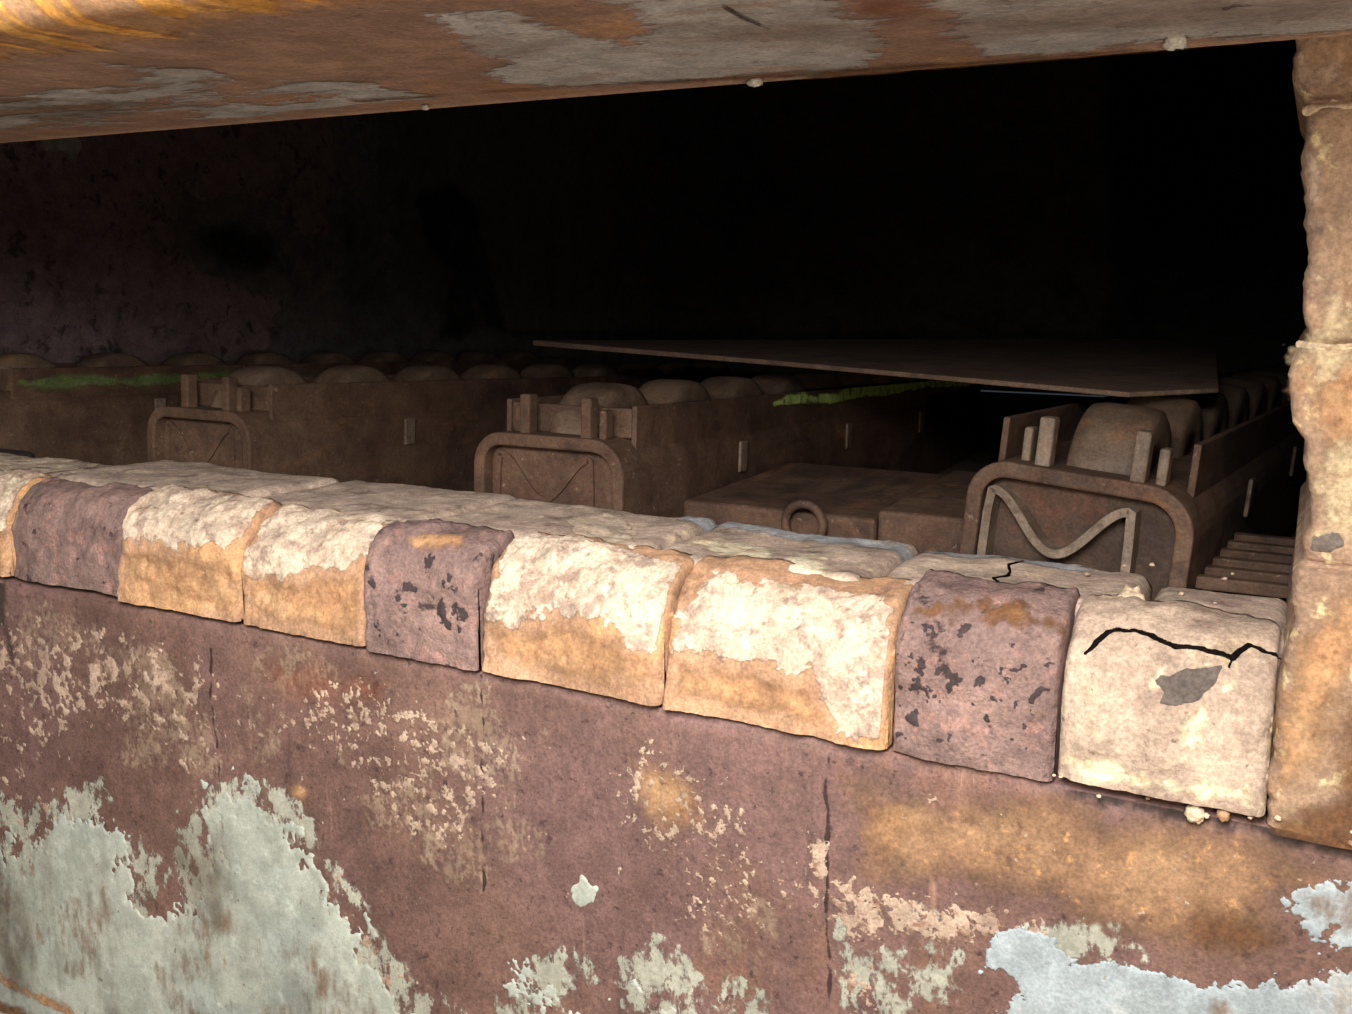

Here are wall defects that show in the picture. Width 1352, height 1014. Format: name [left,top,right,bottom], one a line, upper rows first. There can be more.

corrosion [0,0,362,62]
peeling [425,0,891,88]
corrosion [625,51,1143,84]
peeling [920,0,1352,92]
crack [1084,627,1282,668]
spalling [1155,665,1222,706]
peeling [0,616,518,1014]
corrosion [1278,758,1352,850]
peeling [606,739,1352,1014]
corrosion [869,801,1307,936]
corrosion [0,951,73,1014]
peeling [494,941,598,1014]